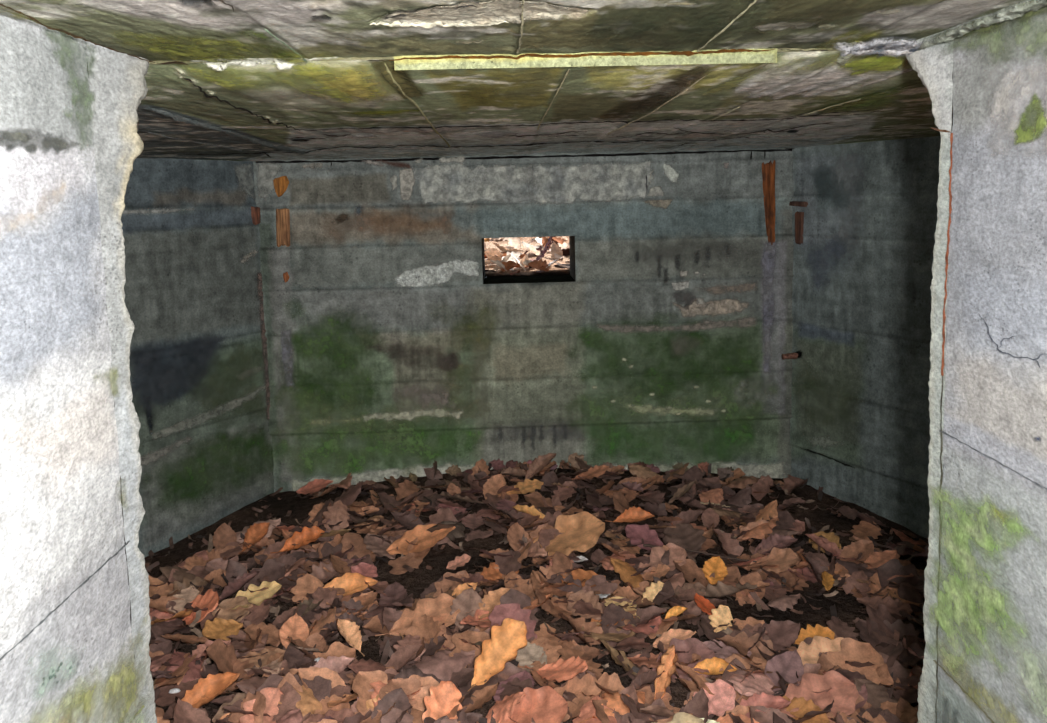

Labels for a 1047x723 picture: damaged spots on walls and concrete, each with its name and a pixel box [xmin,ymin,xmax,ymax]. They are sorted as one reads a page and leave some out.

crack [0,4,883,166]
peeling [738,0,1047,99]
peeling [390,157,679,209]
spalling [395,260,479,287]
damp [133,335,266,465]
crack [930,127,1047,590]
crack [801,448,854,468]
crack [933,622,994,723]